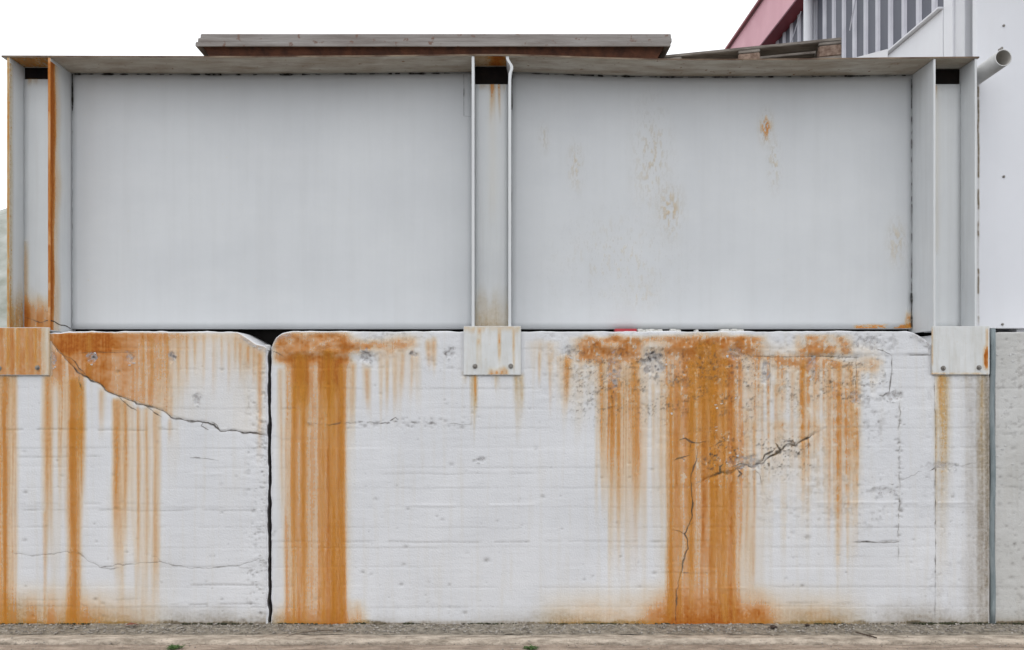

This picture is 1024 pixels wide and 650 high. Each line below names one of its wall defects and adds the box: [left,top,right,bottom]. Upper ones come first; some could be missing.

rust [0,57,179,625]
crack [32,319,262,435]
rust [275,333,407,625]
rust [565,335,849,624]
crack [673,434,814,620]
rust [832,382,859,475]